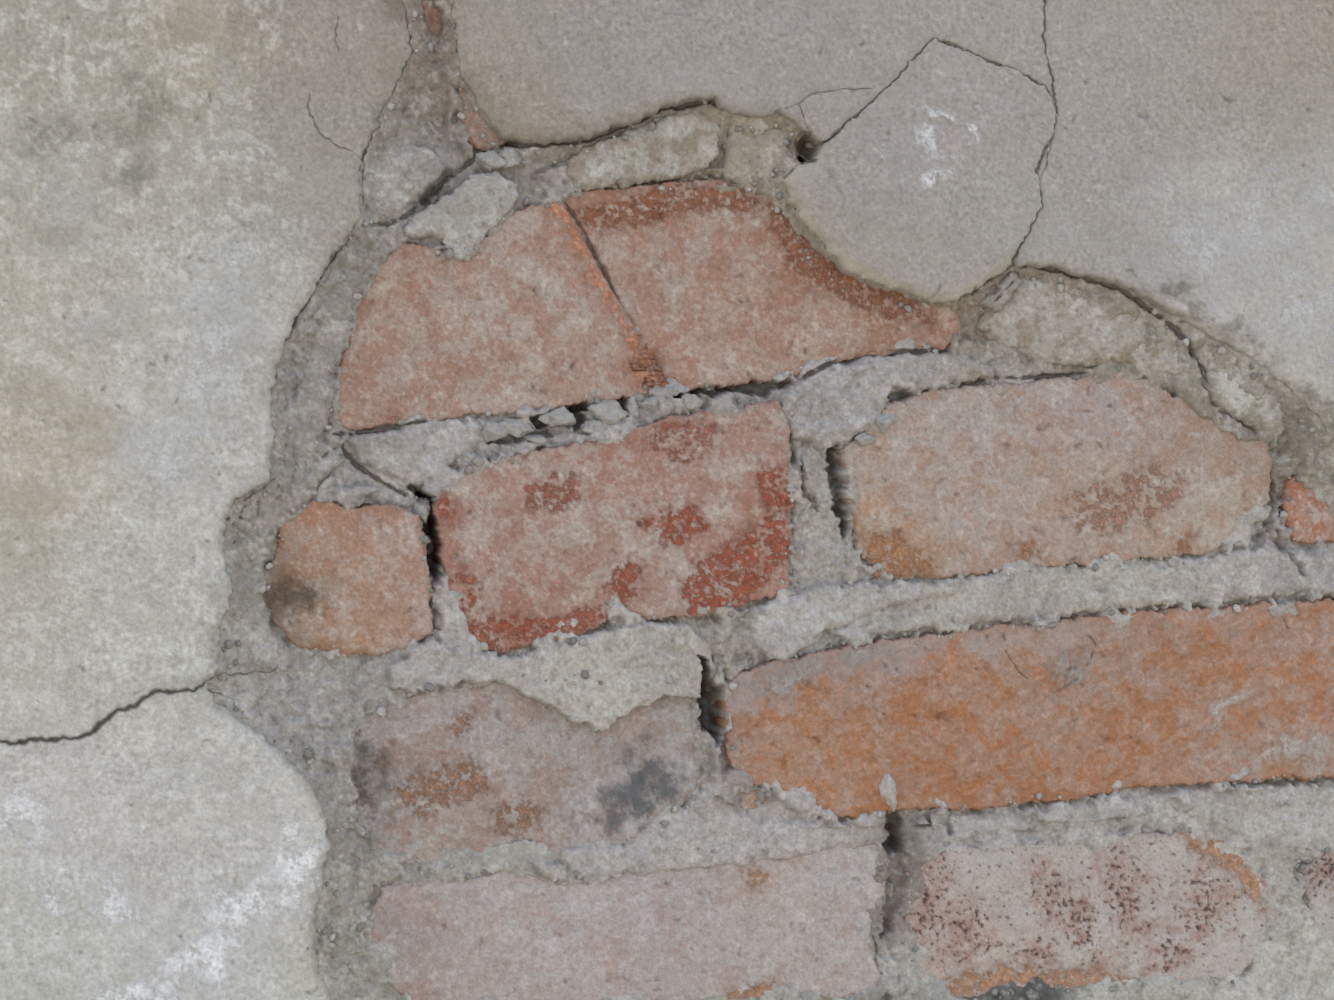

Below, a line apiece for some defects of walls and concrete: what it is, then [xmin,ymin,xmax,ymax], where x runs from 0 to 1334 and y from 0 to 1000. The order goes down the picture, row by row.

spalling [402,0,491,153]
crack [776,88,874,143]
crack [913,0,1209,385]
spalling [208,81,1334,1000]
crack [0,666,278,745]